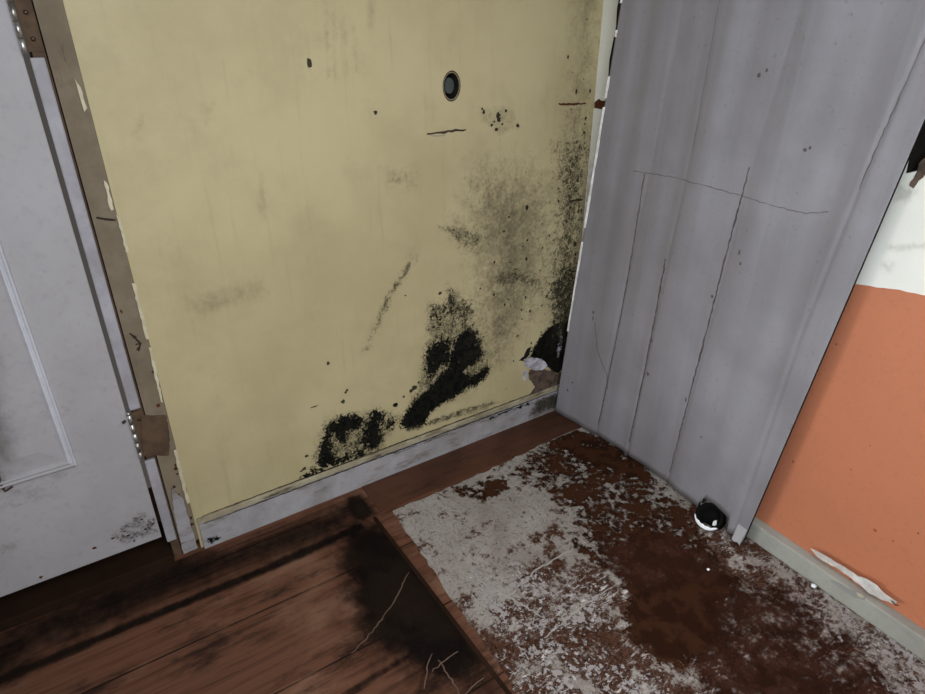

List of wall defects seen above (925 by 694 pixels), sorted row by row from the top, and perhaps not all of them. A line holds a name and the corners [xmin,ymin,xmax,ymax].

spalling [906,124,925,188]
leakage [493,205,534,320]
leakage [541,117,589,352]
leakage [297,289,491,481]
leakage [490,393,558,420]